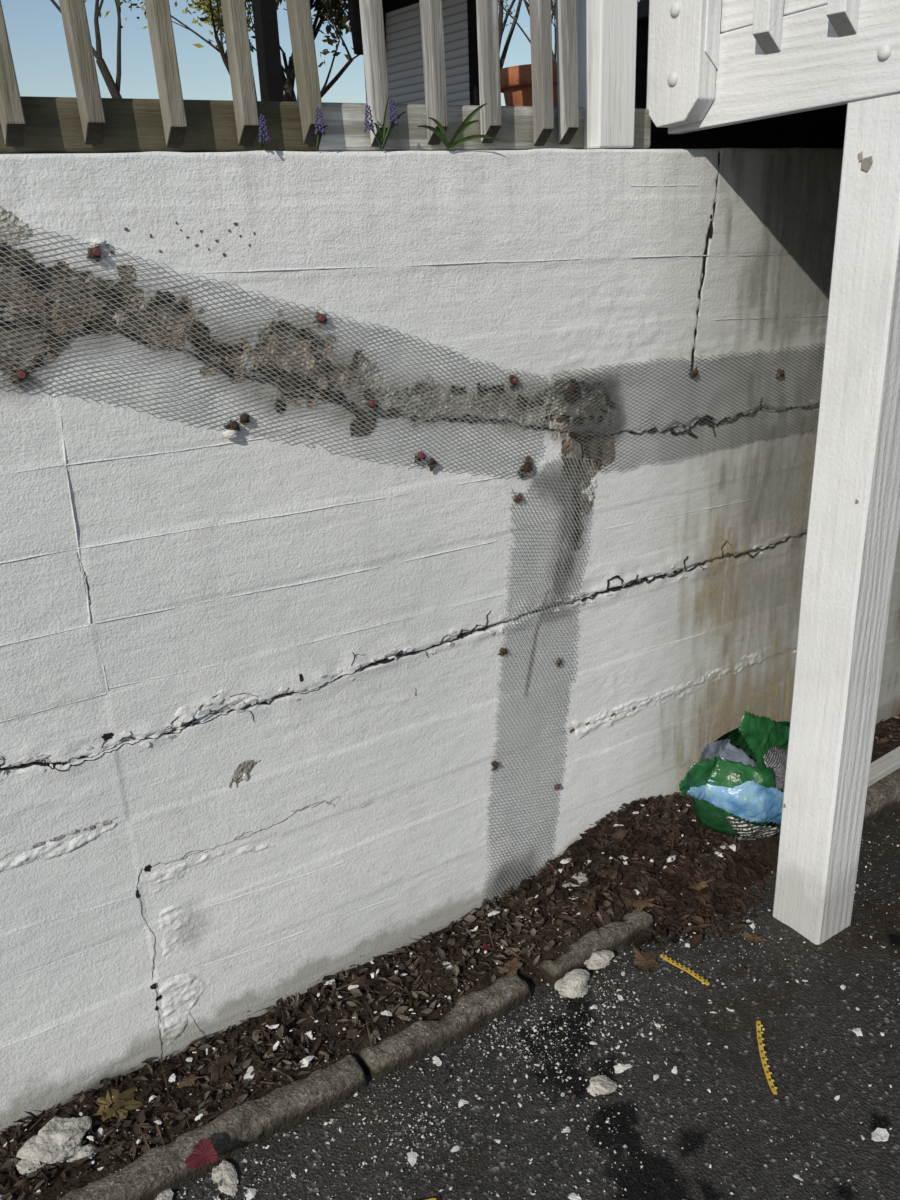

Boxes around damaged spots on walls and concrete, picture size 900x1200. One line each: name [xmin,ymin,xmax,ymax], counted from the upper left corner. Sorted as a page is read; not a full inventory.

spalling [0,206,615,551]
crack [0,306,820,469]
crack [691,153,720,370]
crack [0,532,807,775]
leakage [526,383,624,691]
crack [136,796,374,1059]